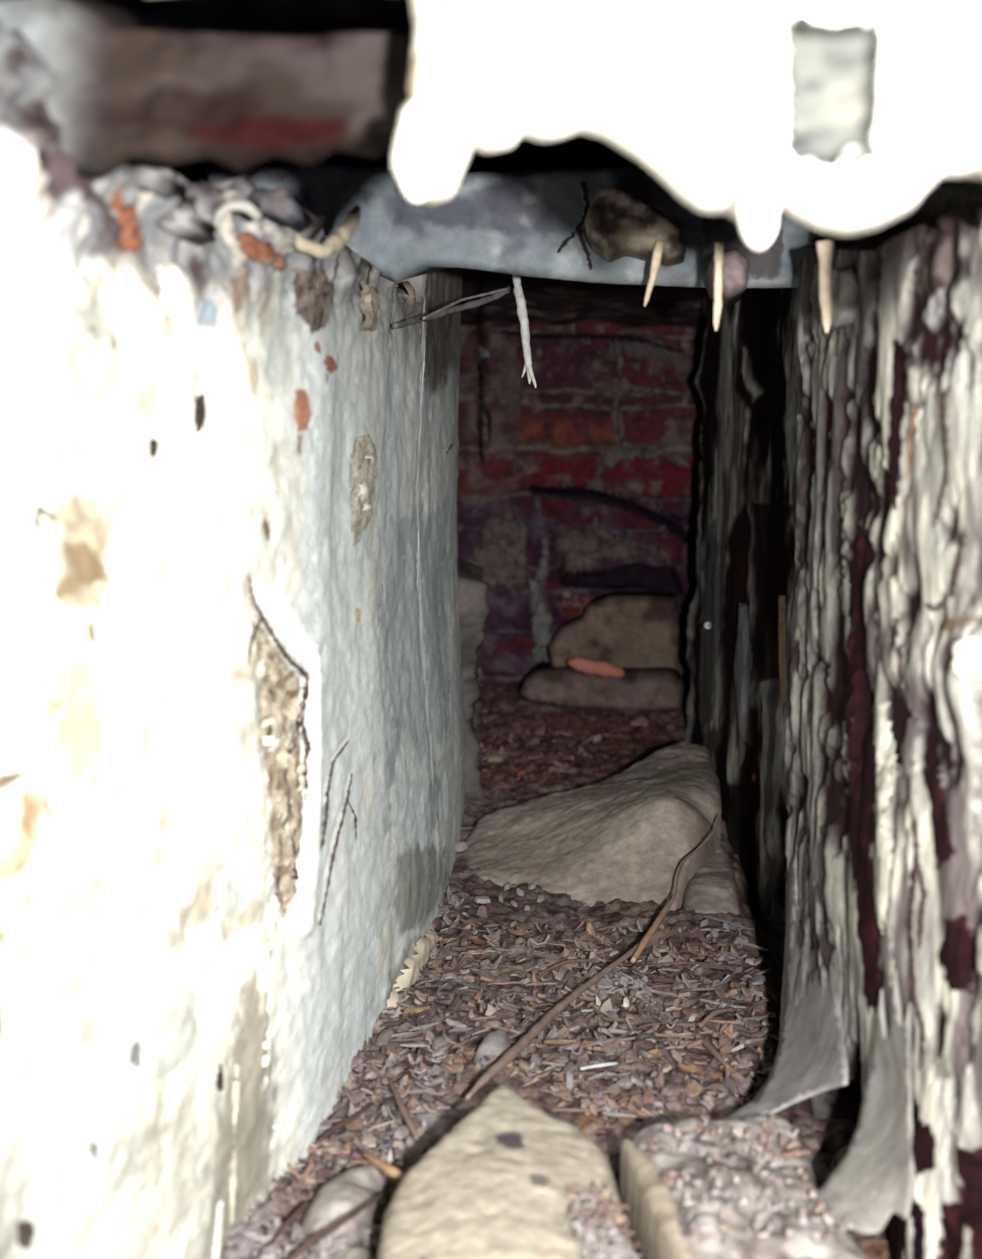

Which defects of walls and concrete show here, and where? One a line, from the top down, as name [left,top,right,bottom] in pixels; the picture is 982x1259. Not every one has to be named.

flaking render [110,183,144,253]
flaking render [157,264,188,319]
flaking render [233,231,335,332]
flaking render [913,203,982,301]
peeling [887,339,909,510]
flaking render [350,435,378,545]
peeling [951,637,980,679]
flaking render [252,574,322,920]
peeling [842,528,956,1013]
peeling [938,914,982,994]
peeling [912,1119,936,1176]
peeling [890,1147,982,1259]